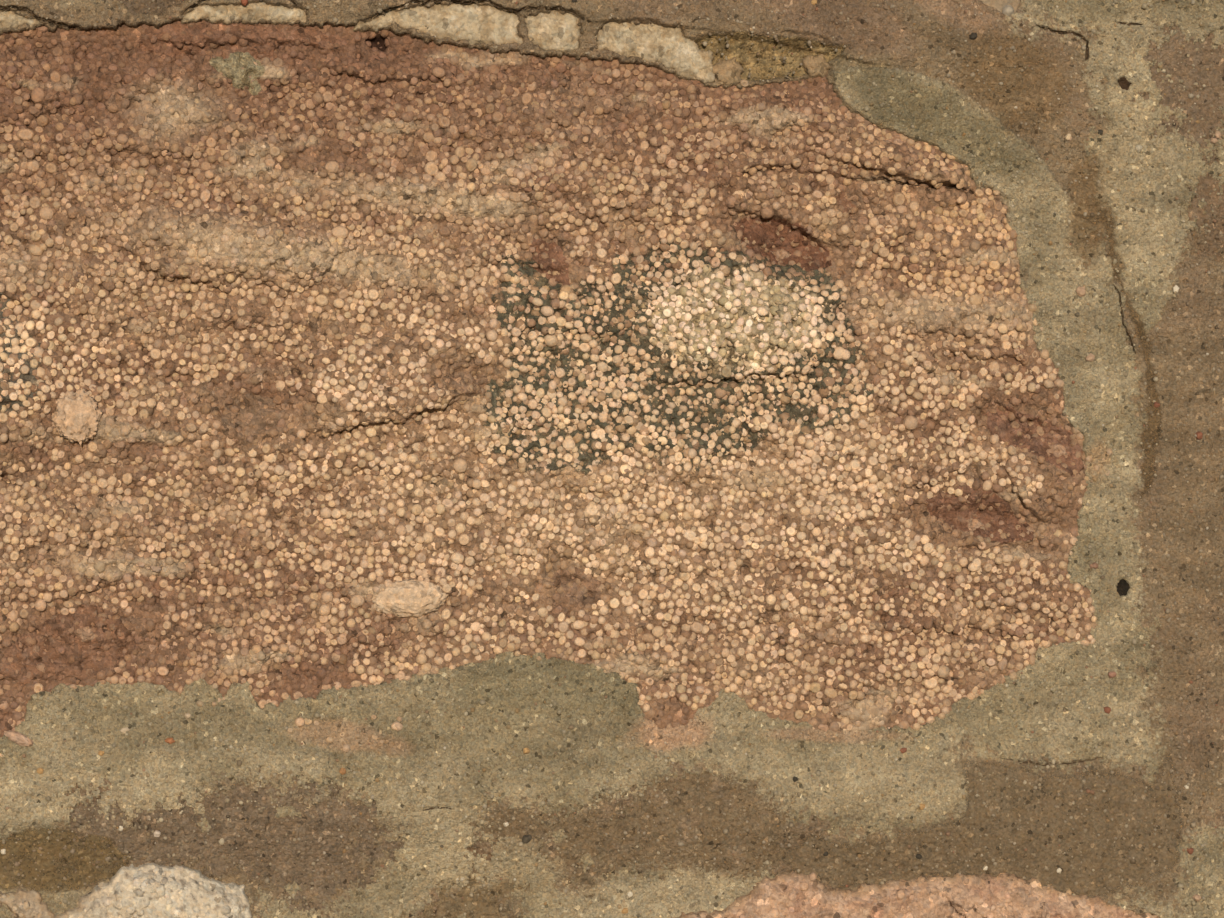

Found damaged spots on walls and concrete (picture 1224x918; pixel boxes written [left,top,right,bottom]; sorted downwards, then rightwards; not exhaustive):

peeling [0,10,40,35]
peeling [135,2,581,58]
crack [360,0,584,21]
peeling [596,21,744,86]
crack [1038,25,1089,60]
spalling [529,237,570,285]
spalling [733,217,833,272]
spalling [220,393,287,436]
spalling [983,406,1084,477]
spalling [926,484,1034,544]
spalling [549,567,602,610]
spalling [0,604,138,687]